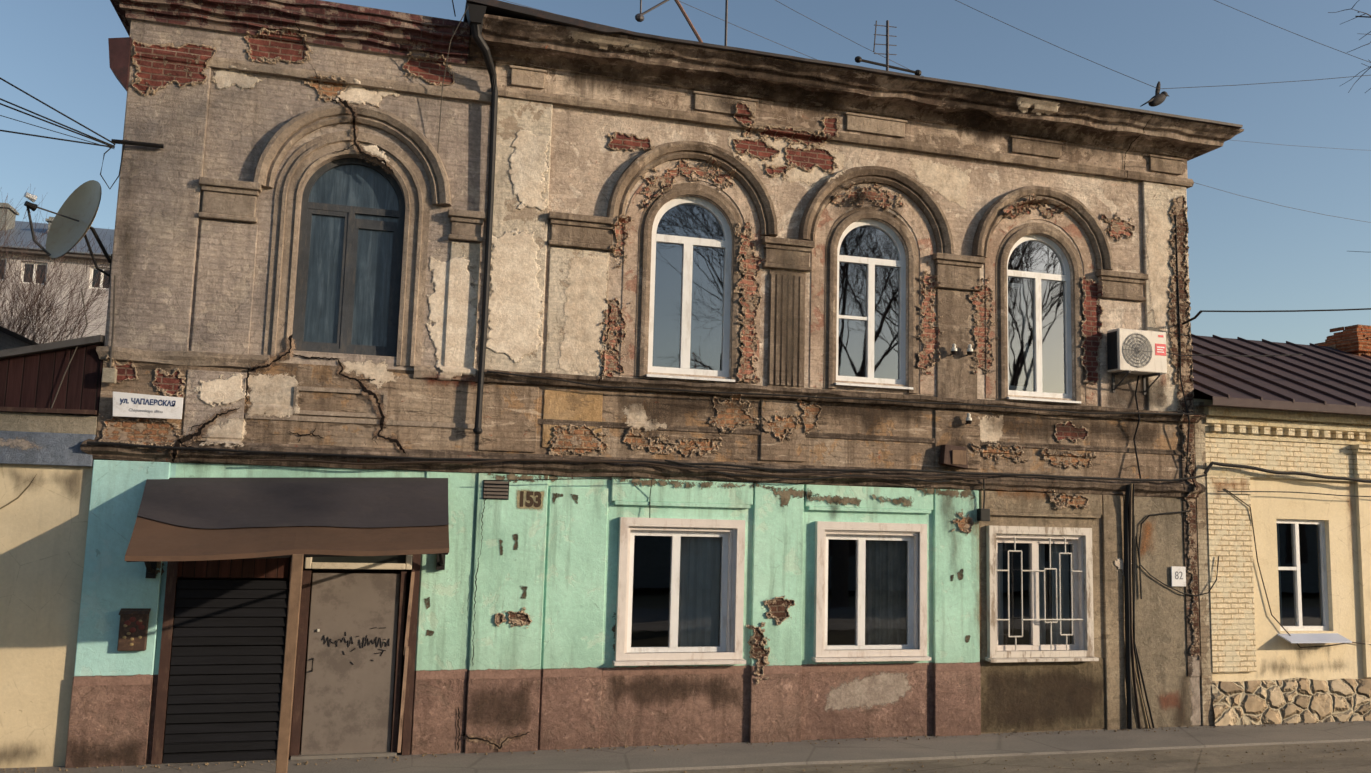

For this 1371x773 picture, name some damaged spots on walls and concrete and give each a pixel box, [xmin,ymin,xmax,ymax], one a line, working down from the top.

spalling [130,26,455,108]
crack [294,17,394,174]
water stain [571,70,647,94]
water stain [719,54,848,112]
flaking render [426,101,904,381]
flaking render [98,354,300,449]
crack [169,335,406,462]
crack [0,474,37,509]
spalling [1101,195,1202,725]
spalling [746,596,795,684]
water stain [615,678,737,702]
water stain [987,673,1102,727]